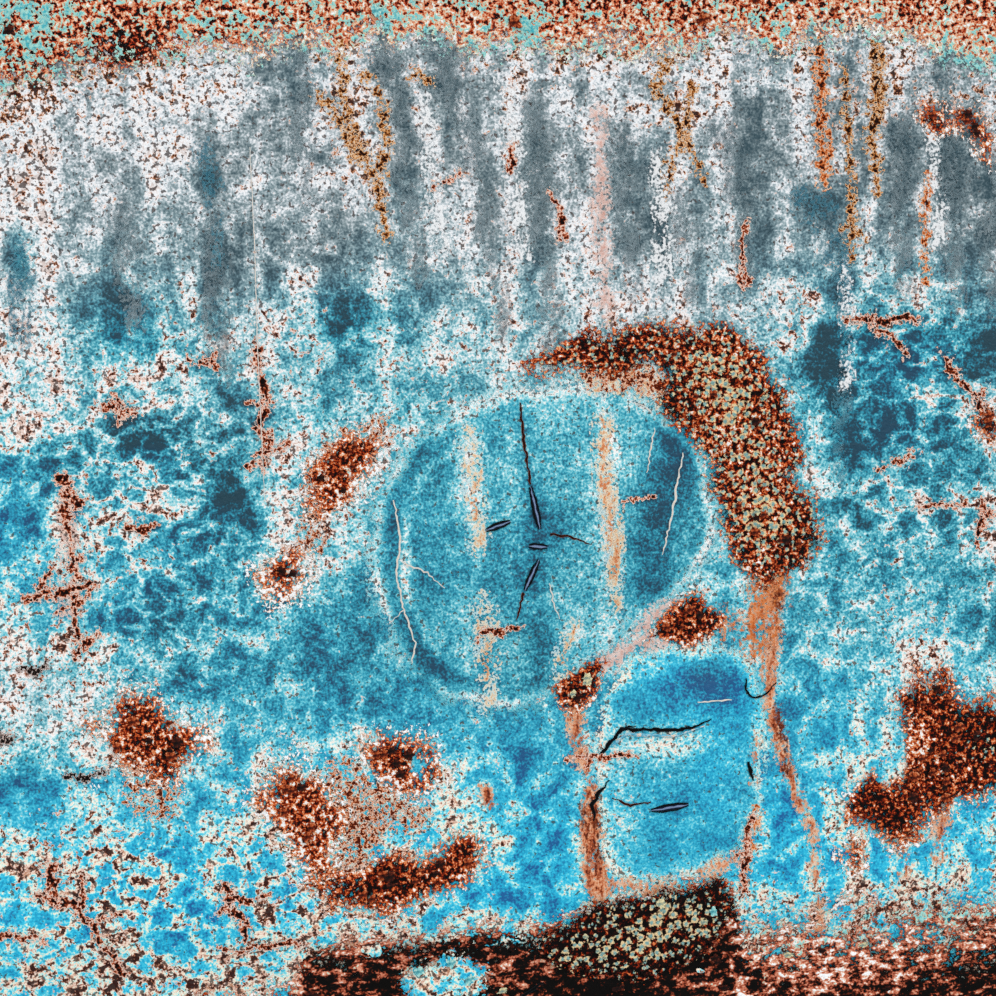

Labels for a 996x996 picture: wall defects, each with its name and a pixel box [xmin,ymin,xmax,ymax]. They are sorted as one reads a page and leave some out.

water stain [372,37,569,369]
corrosion [0,0,996,267]
water stain [605,112,701,308]
water stain [883,108,996,323]
water stain [788,183,860,487]
corrosion [55,506,84,619]
corrosion [69,674,222,824]
water stain [469,589,503,716]
crack [472,402,592,645]
corrosion [186,91,996,996]
water stain [589,409,627,615]
crack [563,718,712,821]